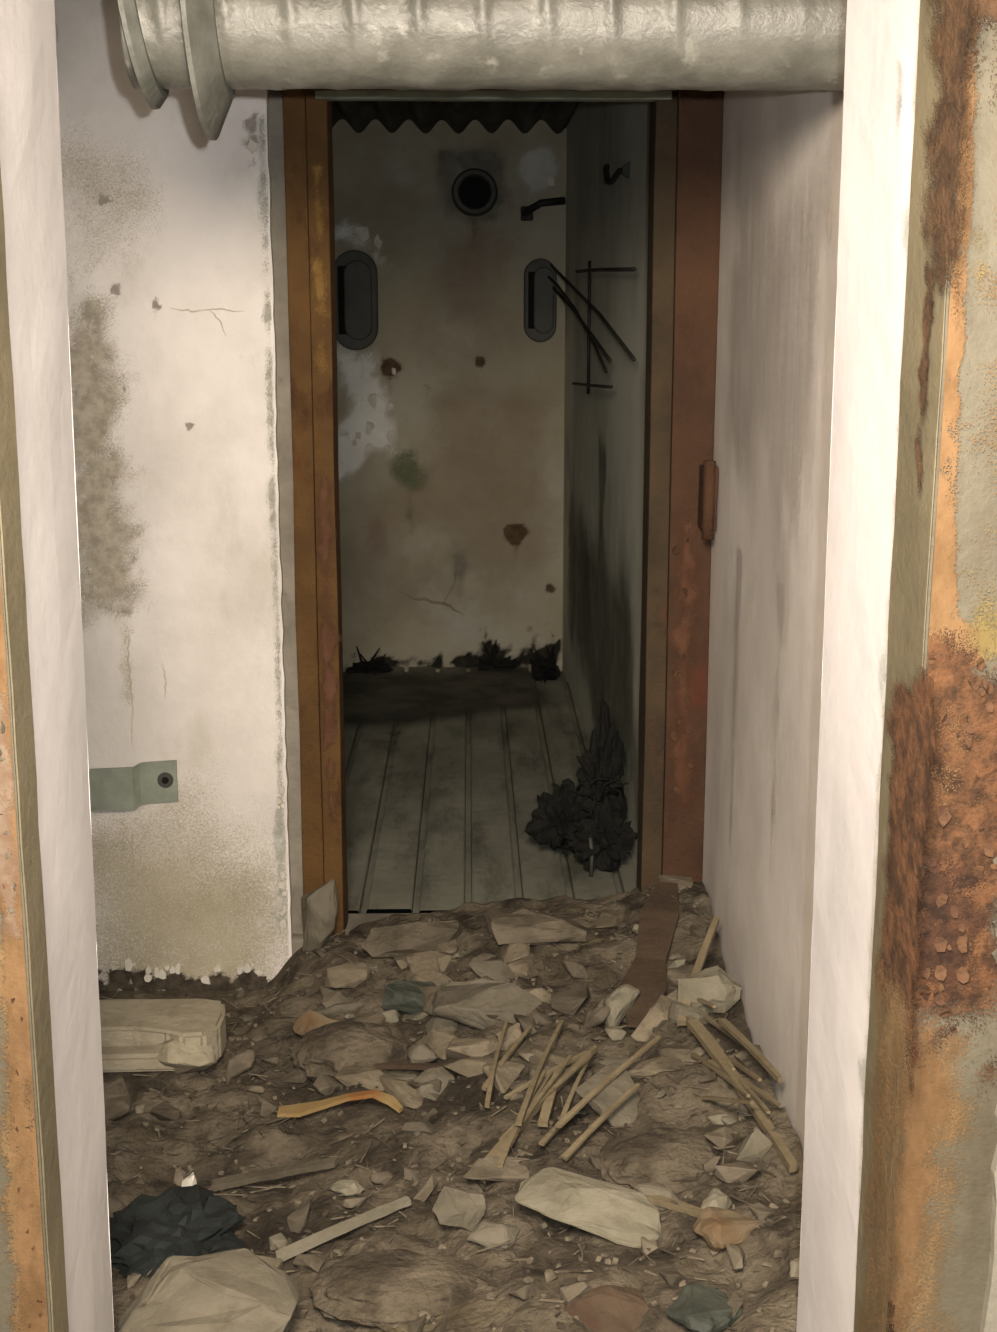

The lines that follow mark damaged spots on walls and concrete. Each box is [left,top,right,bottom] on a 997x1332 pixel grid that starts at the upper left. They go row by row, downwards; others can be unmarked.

peeling [0,691,23,939]
leakage [60,113,167,710]
corrosion [855,0,997,1332]